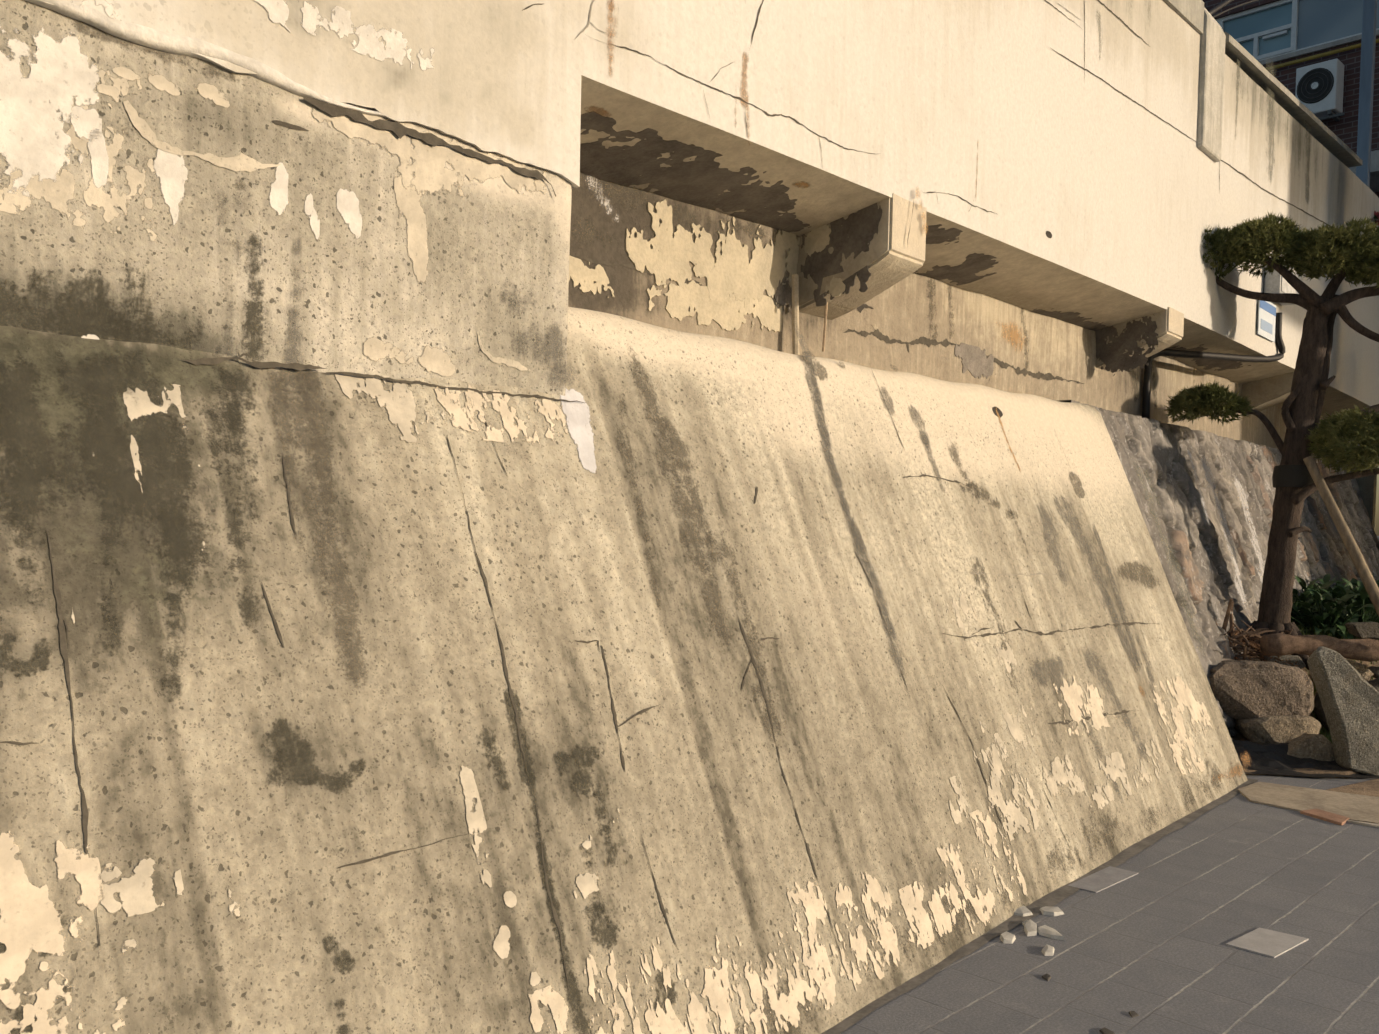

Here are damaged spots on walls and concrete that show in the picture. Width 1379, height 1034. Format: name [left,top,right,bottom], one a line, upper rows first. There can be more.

peeling [0,26,230,241]
crack [575,0,874,167]
peeling [580,112,882,352]
damp [57,268,156,564]
damp [208,235,366,683]
damp [0,634,50,677]
crack [46,530,90,858]
damp [159,501,191,695]
crack [447,437,570,997]
crack [942,572,1156,655]
peeling [0,831,184,1034]
peeling [584,676,1213,1034]